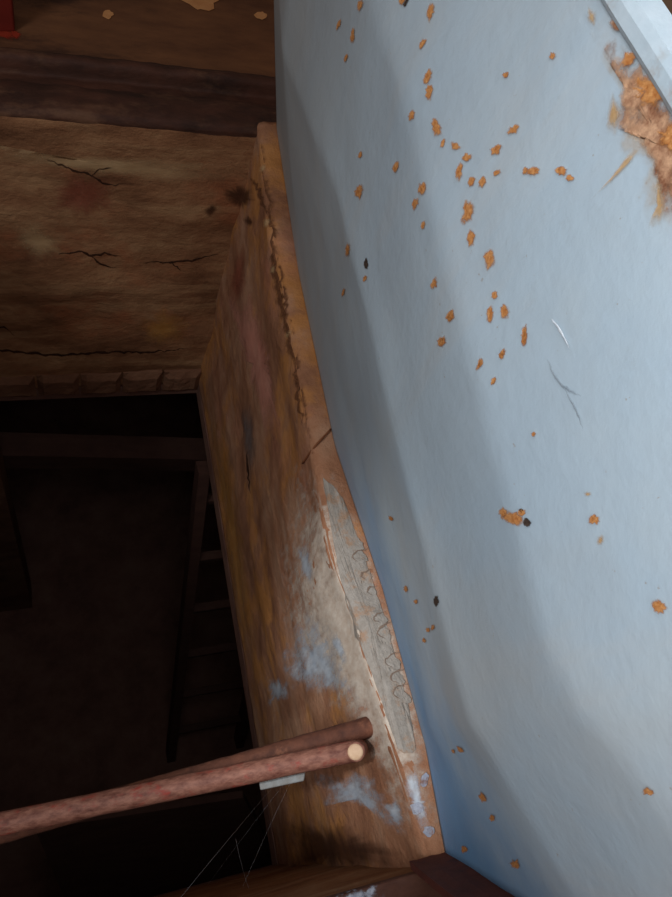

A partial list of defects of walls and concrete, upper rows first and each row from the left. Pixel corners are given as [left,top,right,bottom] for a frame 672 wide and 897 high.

crack [48,160,124,186]
crack [60,251,119,268]
crack [147,254,216,270]
water stain [293,507,417,768]